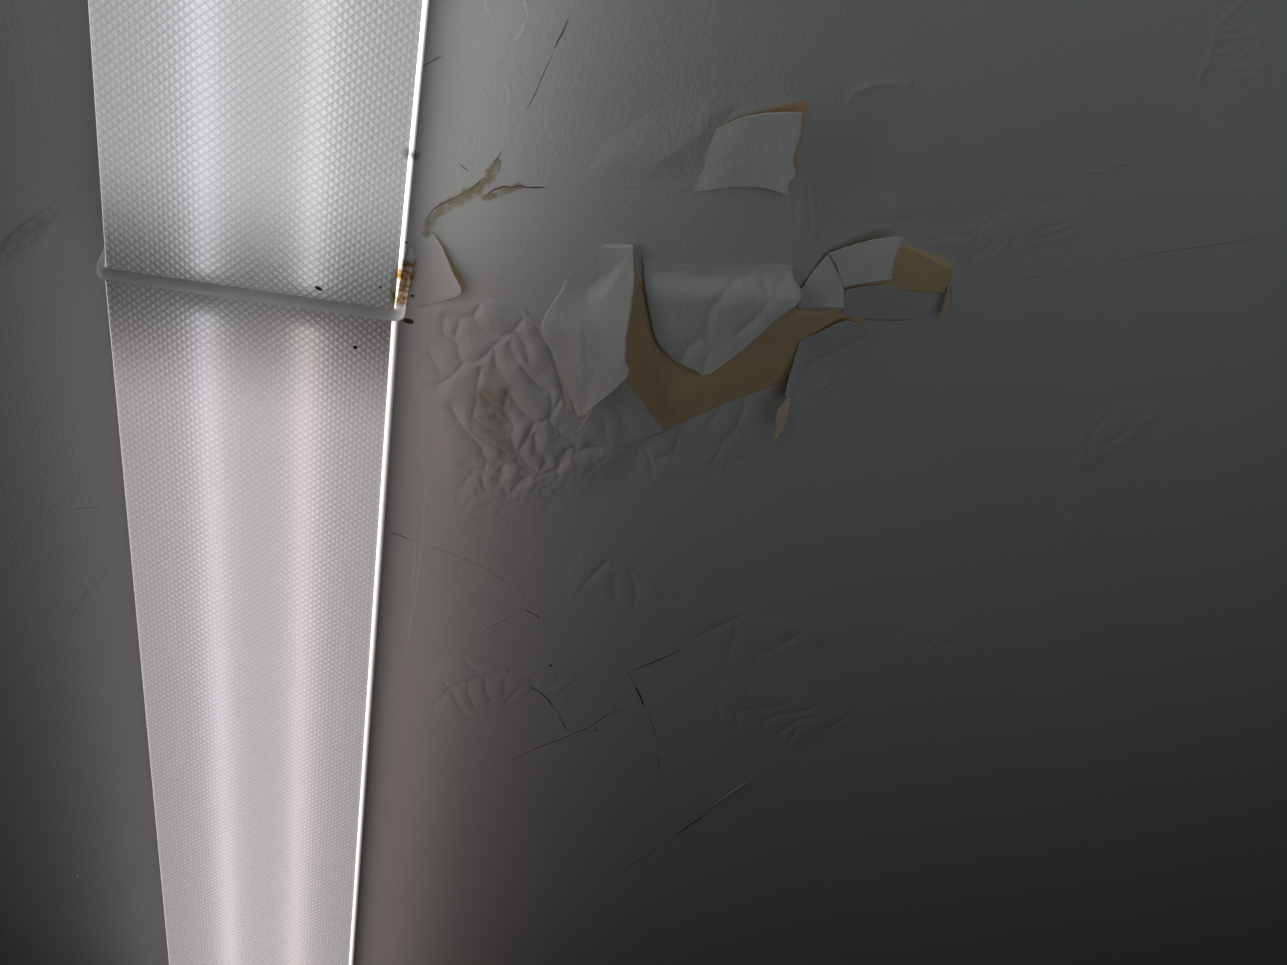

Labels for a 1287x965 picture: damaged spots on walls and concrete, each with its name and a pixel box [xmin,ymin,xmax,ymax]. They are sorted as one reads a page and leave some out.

peeling [541,236,954,447]
crack [506,650,680,772]